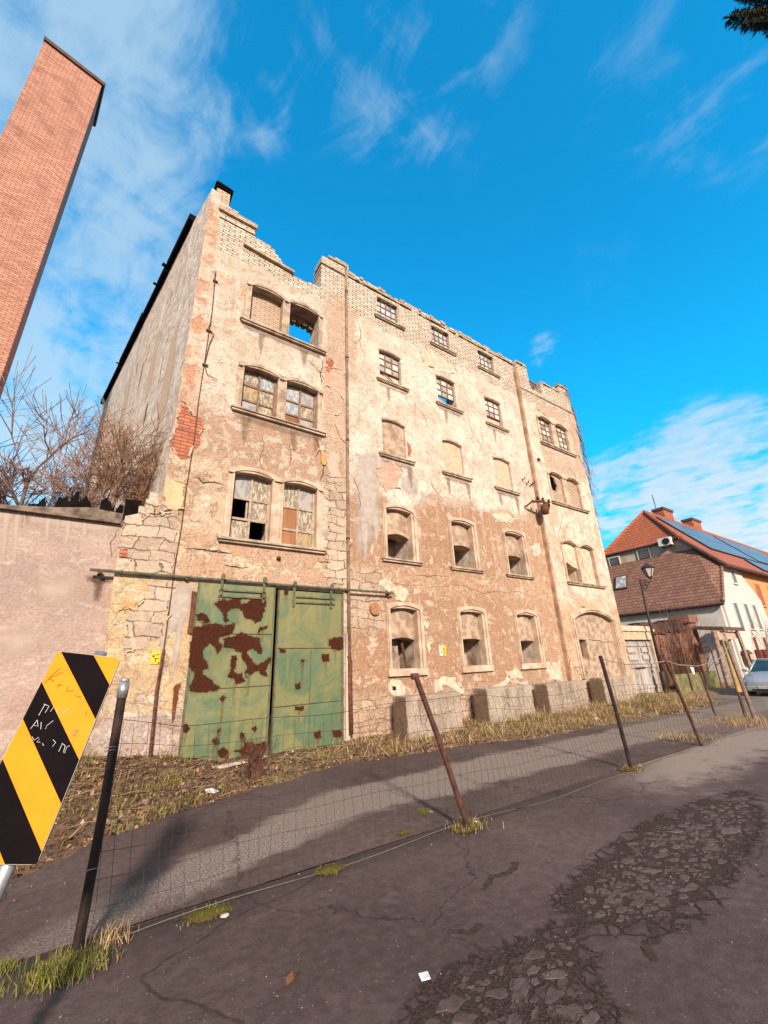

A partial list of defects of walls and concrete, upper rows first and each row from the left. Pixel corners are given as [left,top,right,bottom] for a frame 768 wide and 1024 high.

spalling [169,404,205,459]
spalling [376,442,412,492]
spalling [119,506,184,652]
corrosion [171,594,286,733]
corrosion [322,637,344,662]